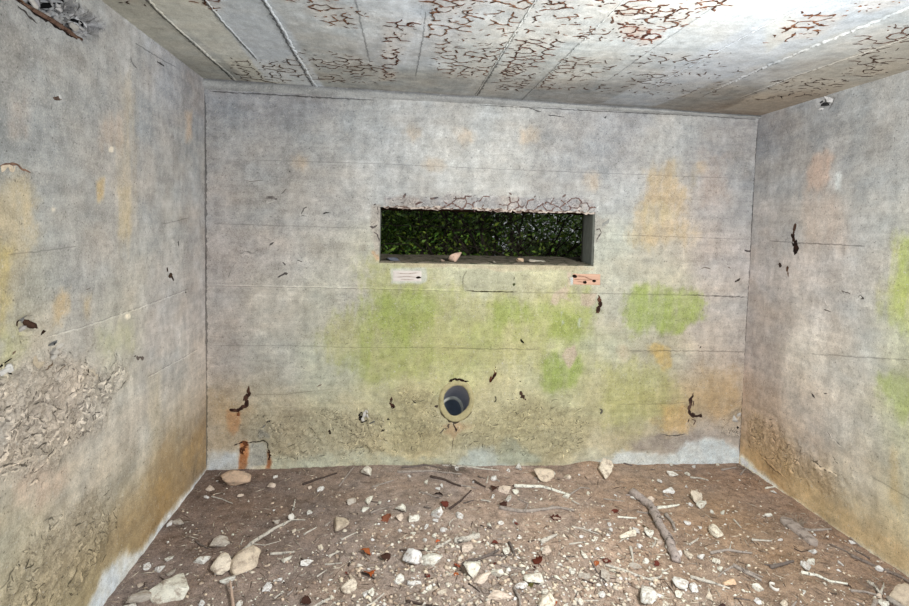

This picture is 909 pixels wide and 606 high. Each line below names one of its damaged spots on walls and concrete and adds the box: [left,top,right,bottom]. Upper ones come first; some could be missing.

spalling [17,0,109,44]
crack [179,0,232,15]
crack [223,0,909,117]
spalling [16,315,38,336]
spalling [0,342,144,606]